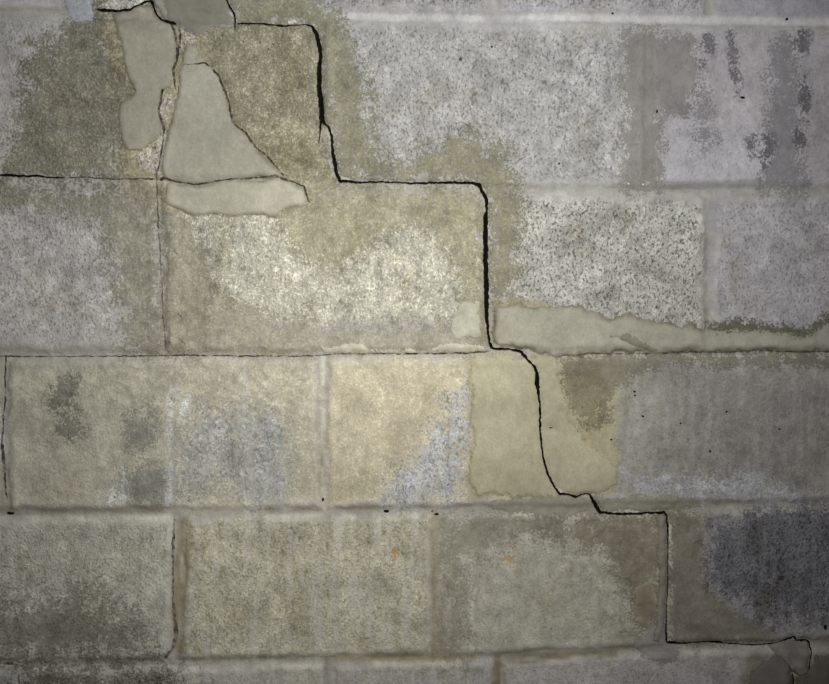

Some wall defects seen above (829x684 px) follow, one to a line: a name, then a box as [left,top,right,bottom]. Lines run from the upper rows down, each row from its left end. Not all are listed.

peeling [64,0,145,22]
crack [0,0,310,266]
spalling [135,92,175,178]
spalling [176,26,199,57]
water stain [615,24,722,196]
water stain [727,30,742,98]
water stain [745,29,812,197]
crack [0,285,345,495]
water stain [0,0,528,513]
crack [226,0,828,670]
crack [165,534,179,658]
water stain [374,378,829,684]